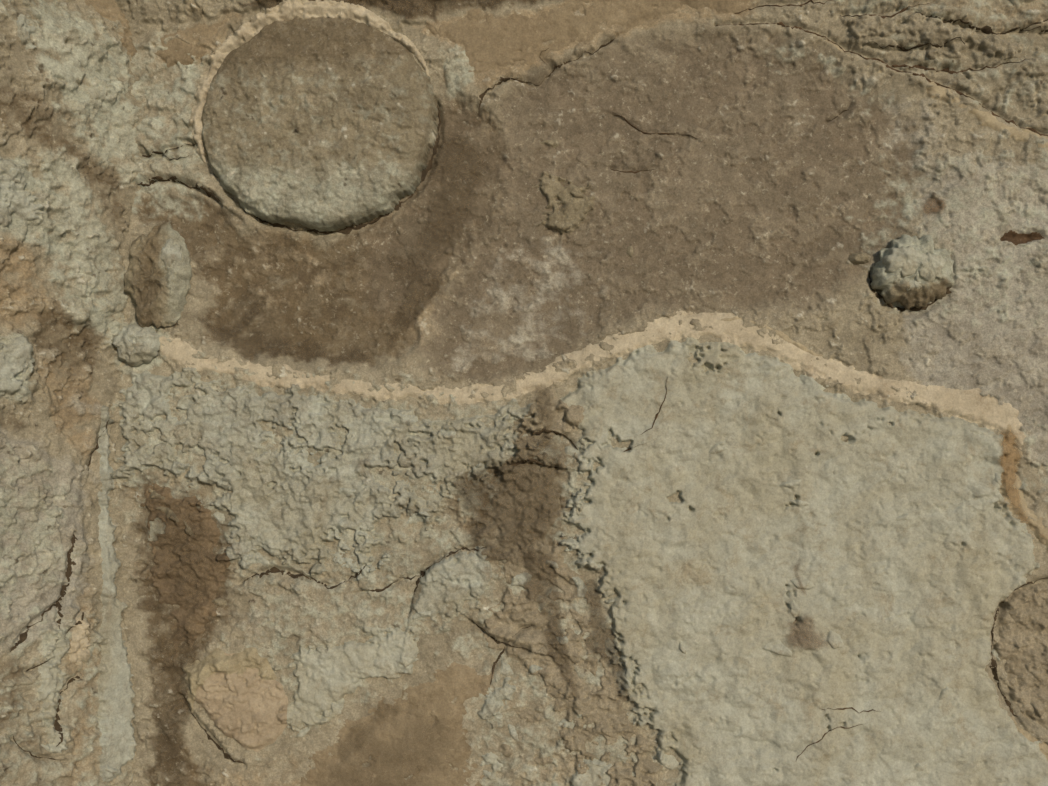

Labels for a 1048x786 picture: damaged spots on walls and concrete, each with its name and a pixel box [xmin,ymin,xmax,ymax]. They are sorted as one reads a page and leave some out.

crack [477,39,614,117]
crack [716,0,1048,136]
peeling [847,9,1023,63]
crack [613,115,697,139]
peeling [531,171,595,235]
peeling [848,246,946,291]
spalling [1000,230,1045,245]
crack [10,534,84,671]
crack [243,547,485,613]
peeling [38,337,1048,786]
crack [476,624,532,684]
crack [13,673,81,760]